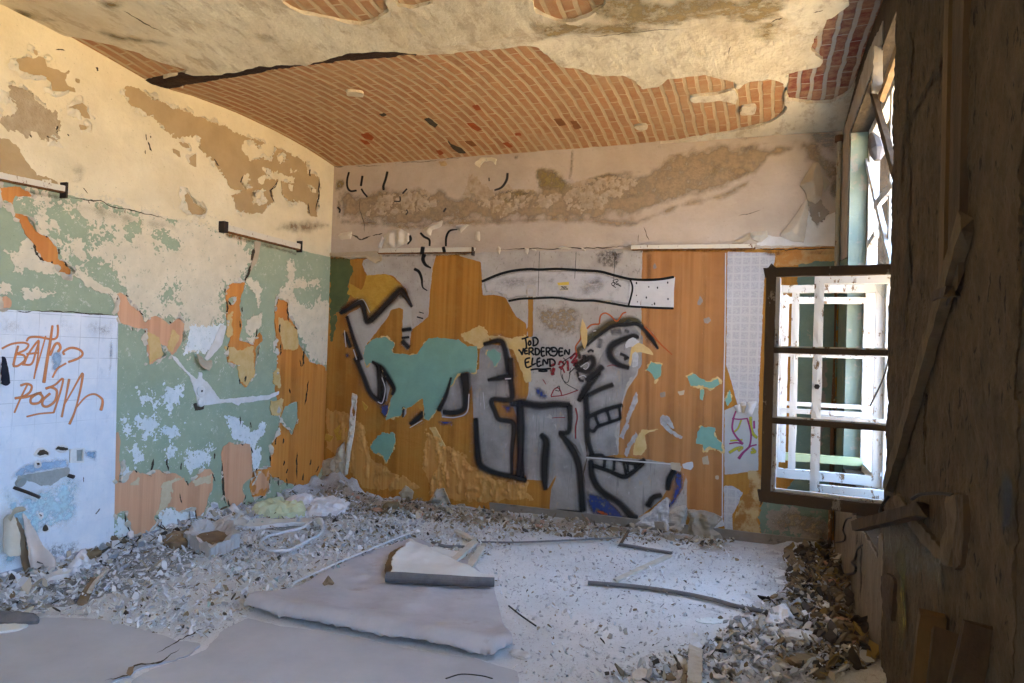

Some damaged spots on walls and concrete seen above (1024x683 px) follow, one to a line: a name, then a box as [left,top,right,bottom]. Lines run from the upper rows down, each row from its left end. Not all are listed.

spalling [0,0,944,476]
water stain [337,145,789,229]
spalling [835,0,1024,683]
peeling [116,382,216,486]
peeling [114,514,131,539]
peeling [149,507,196,532]